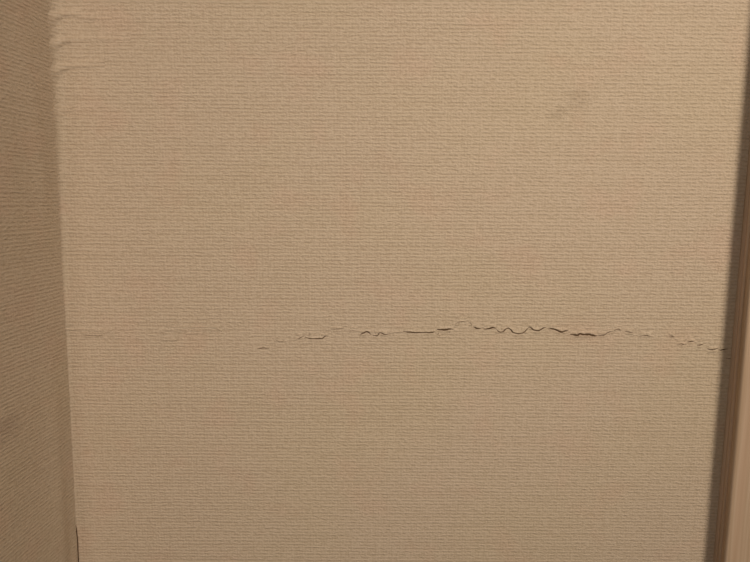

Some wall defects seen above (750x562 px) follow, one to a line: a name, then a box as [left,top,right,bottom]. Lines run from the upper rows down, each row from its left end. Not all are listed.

crack [256,317,731,362]